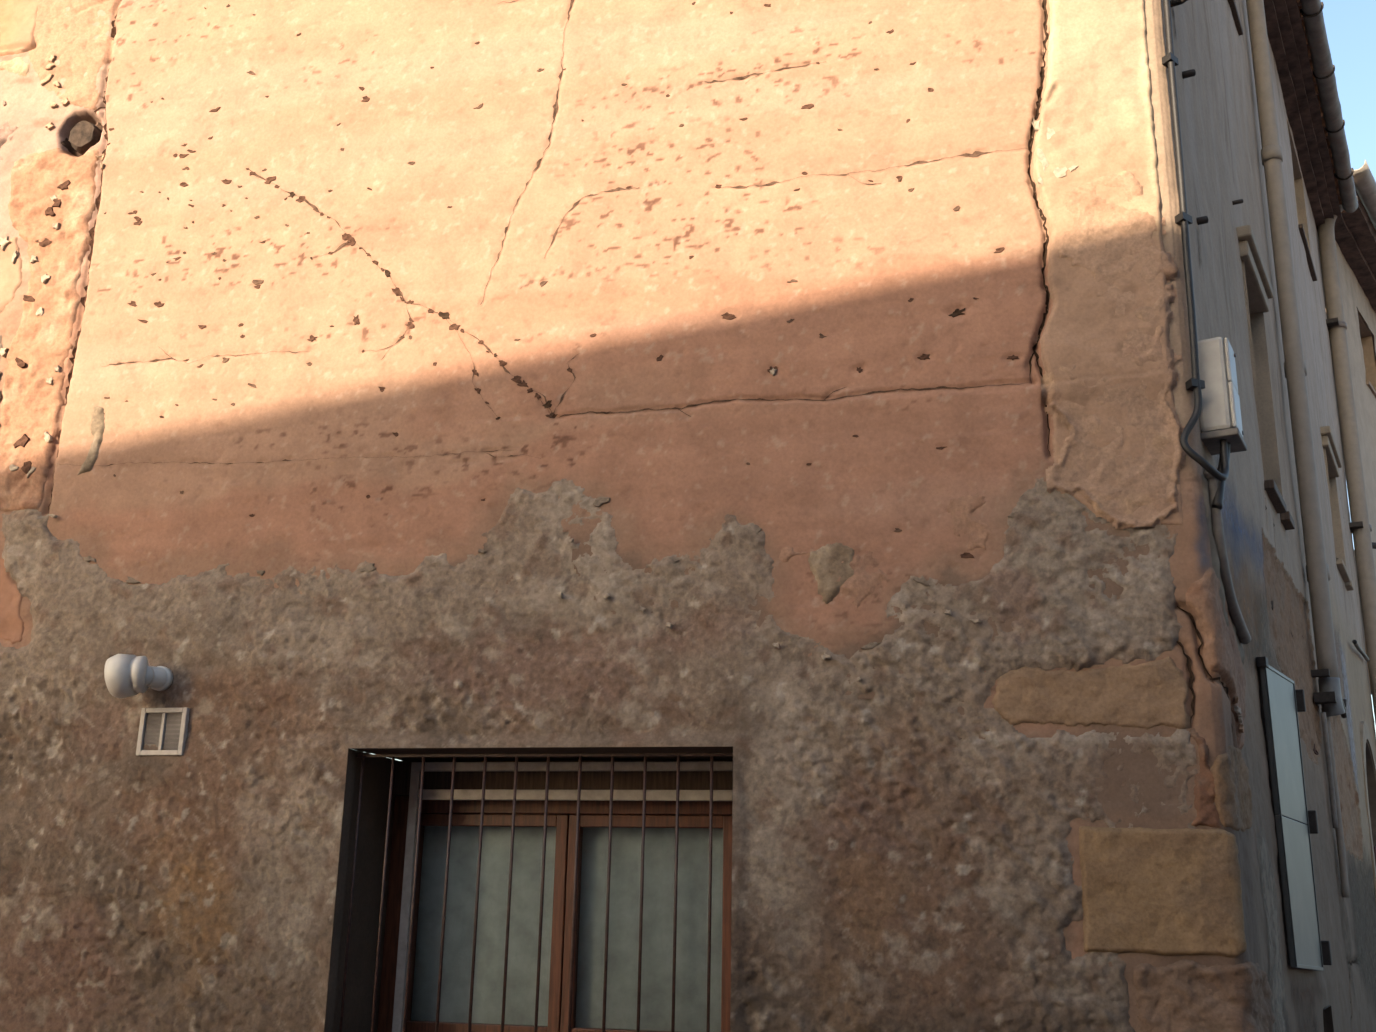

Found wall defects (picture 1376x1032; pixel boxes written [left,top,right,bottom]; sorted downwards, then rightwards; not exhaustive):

spalling [0,121,18,148]
flaking render [0,0,62,88]
crack [48,0,1050,514]
flaking render [1031,0,1187,529]
flaking render [0,144,1183,1032]
flaking render [1123,728,1197,815]
spalling [1262,529,1363,862]